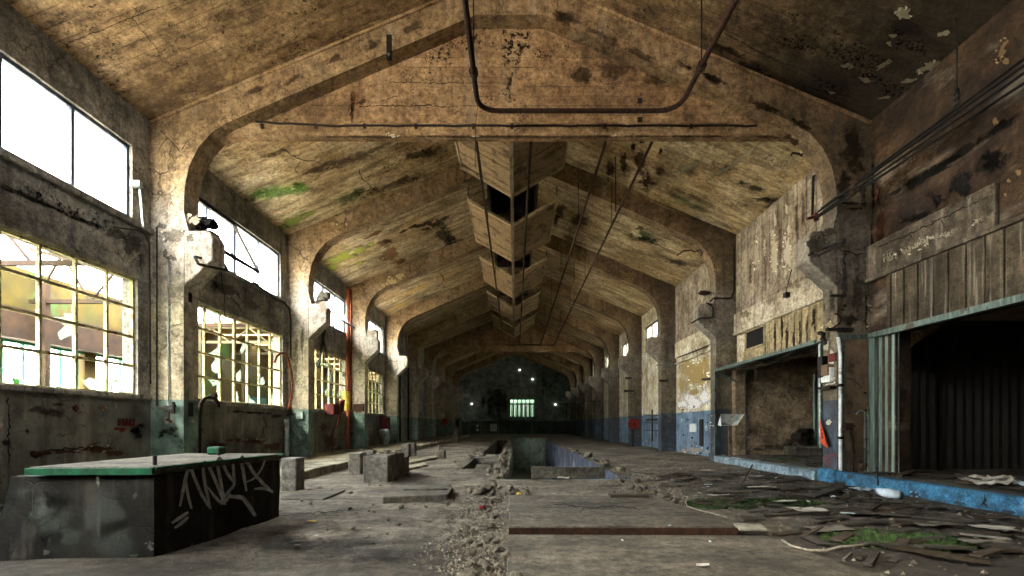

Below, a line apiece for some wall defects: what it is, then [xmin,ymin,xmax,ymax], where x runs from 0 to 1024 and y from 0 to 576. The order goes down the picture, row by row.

spalling [894,6,912,19]
damp [421,29,555,99]
peeling [839,34,897,83]
peeling [900,60,940,83]
peeling [995,37,1009,65]
rust [350,92,366,122]
crack [153,131,192,201]
damp [837,115,1017,245]
damp [430,219,455,245]
peeling [678,355,712,420]